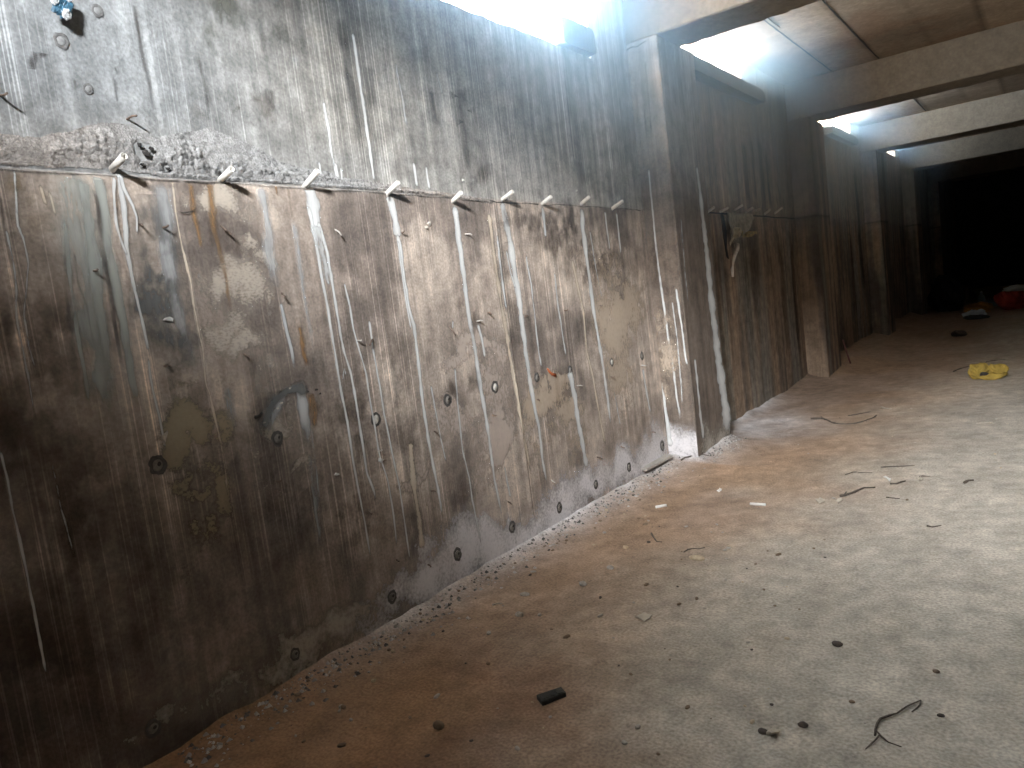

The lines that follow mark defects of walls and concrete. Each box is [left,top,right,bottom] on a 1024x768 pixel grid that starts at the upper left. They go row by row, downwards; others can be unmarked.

leakage [6,173,41,404]
leakage [40,175,186,445]
corrosion [208,185,219,249]
leakage [258,168,730,686]
leakage [0,453,46,670]